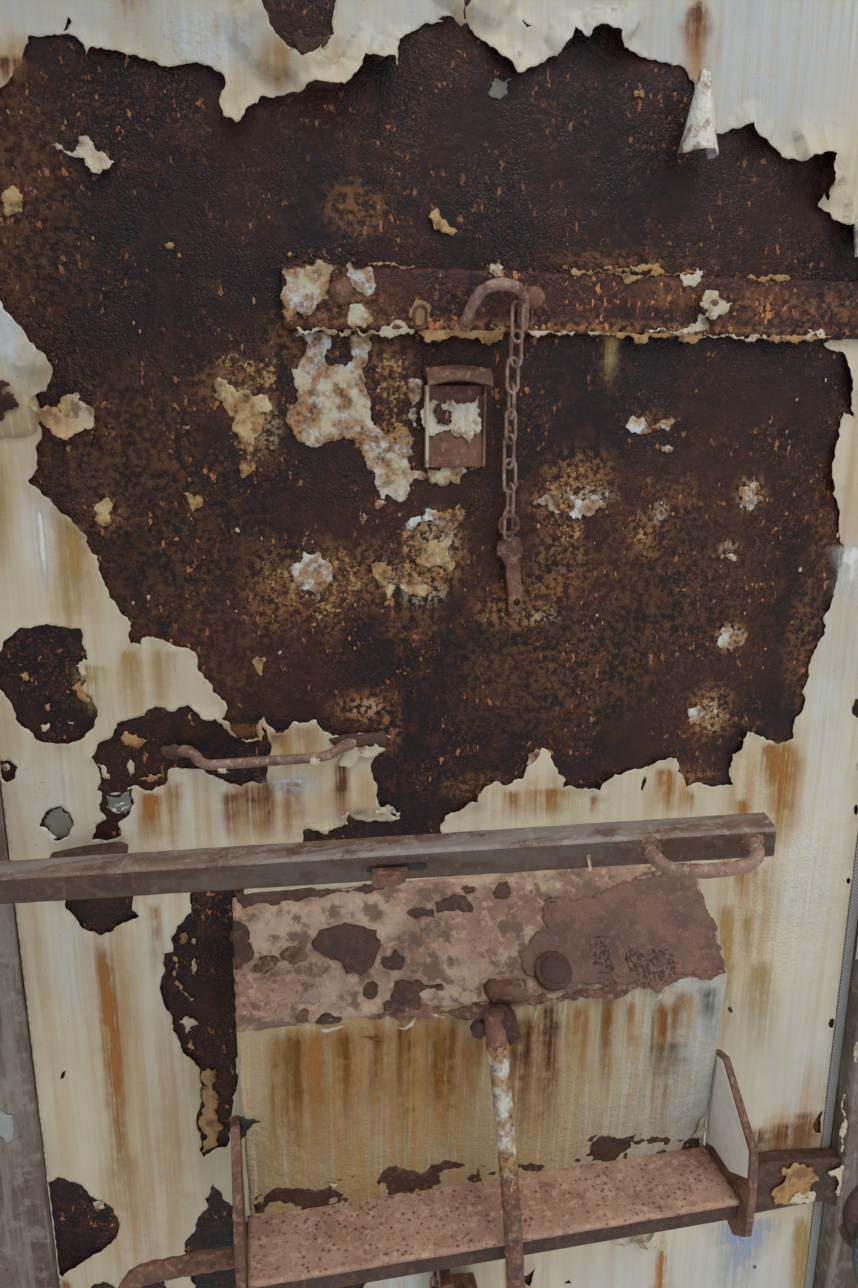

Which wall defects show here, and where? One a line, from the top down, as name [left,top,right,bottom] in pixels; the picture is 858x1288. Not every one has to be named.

corrosion [0,380,19,421]
peeling [0,0,858,842]
corrosion [434,403,454,425]
corrosion [335,766,347,807]
peeling [493,881,511,899]
corrosion [98,952,126,1173]
peeling [160,884,489,1156]
corrosion [272,1019,483,1125]
corrosion [511,994,690,1097]
peeling [49,1177,120,1277]
peeling [190,1260,249,1288]
peeling [184,1174,356,1253]